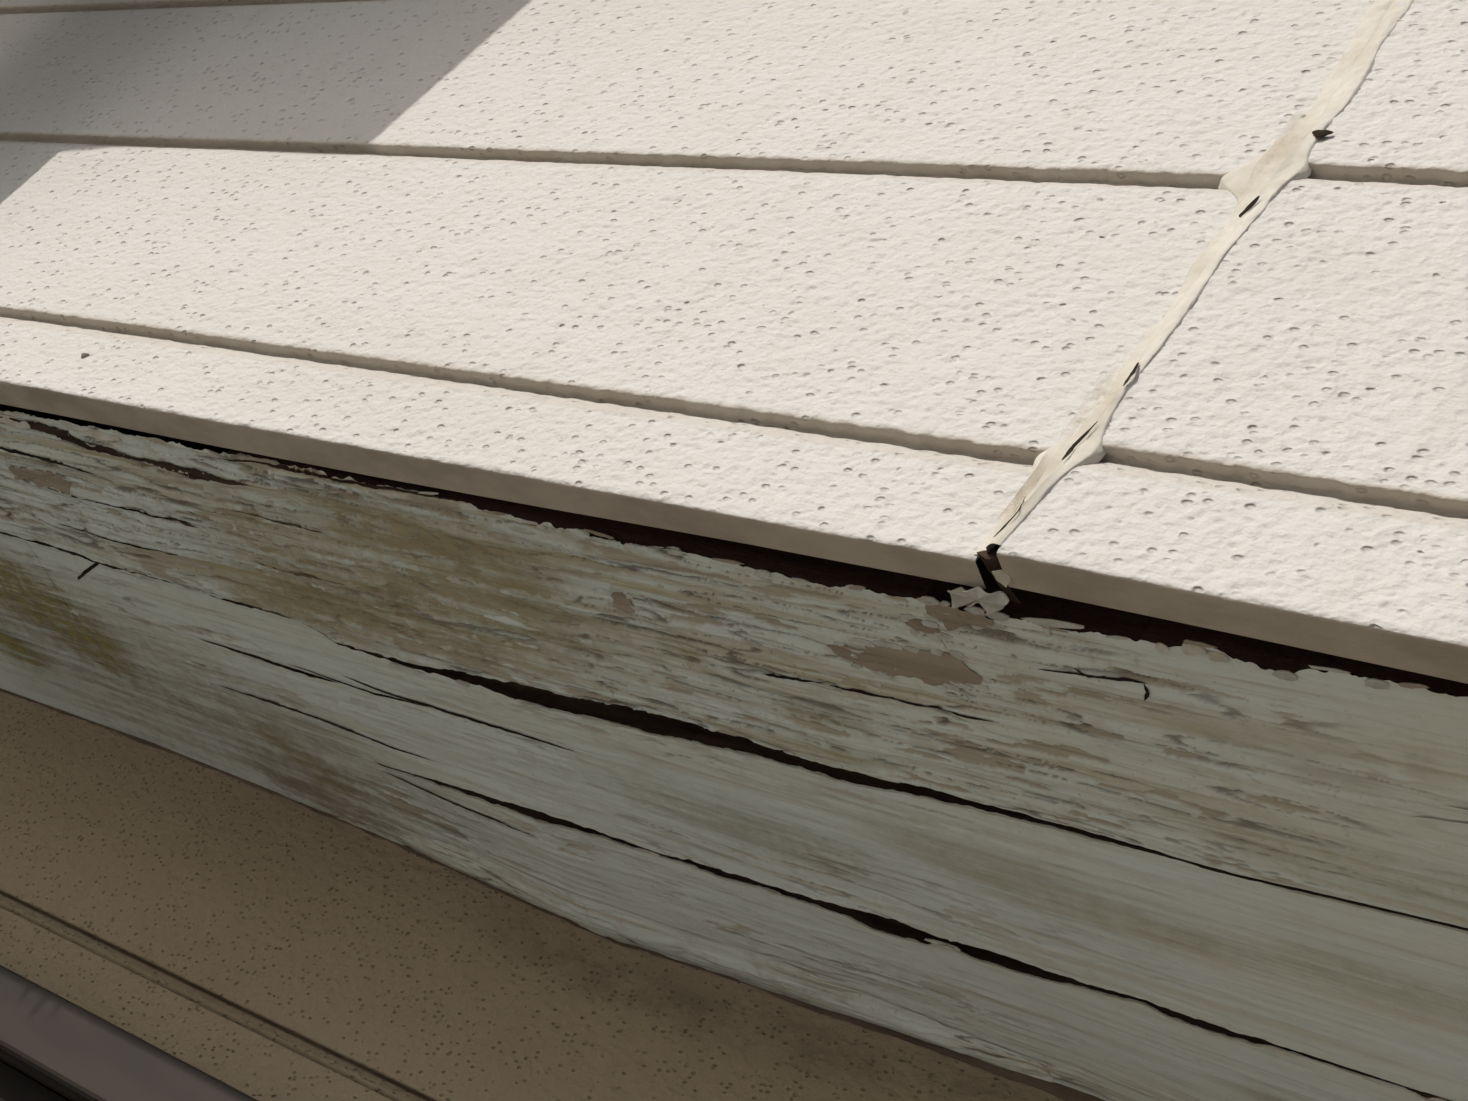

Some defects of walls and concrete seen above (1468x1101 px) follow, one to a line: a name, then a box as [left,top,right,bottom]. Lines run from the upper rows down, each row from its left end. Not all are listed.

crack [1239,196,1260,217]
crack [1123,362,1139,386]
crack [1062,421,1098,460]
peeling [5,463,72,497]
crack [0,414,446,585]
crack [994,496,1026,537]
peeling [753,569,771,579]
peeling [816,596,1009,691]
peeling [1155,642,1229,663]
peeling [1272,670,1298,681]
peeling [1365,678,1389,689]
crack [197,595,1468,1101]